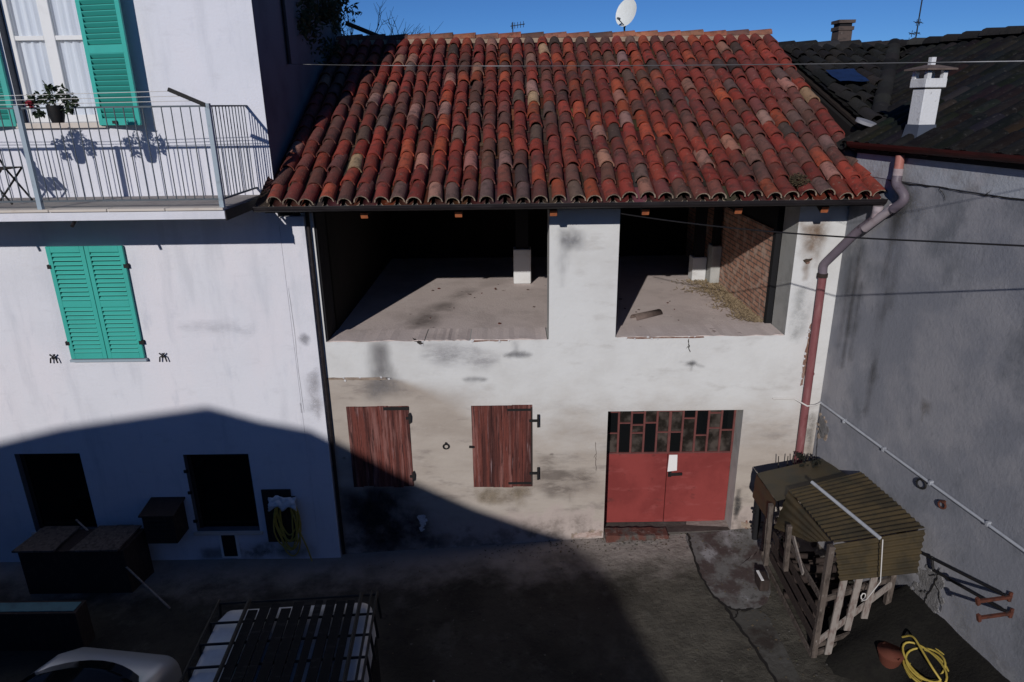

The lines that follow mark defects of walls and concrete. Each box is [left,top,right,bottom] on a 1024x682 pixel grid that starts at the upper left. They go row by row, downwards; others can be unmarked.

spalling [910,564,945,613]